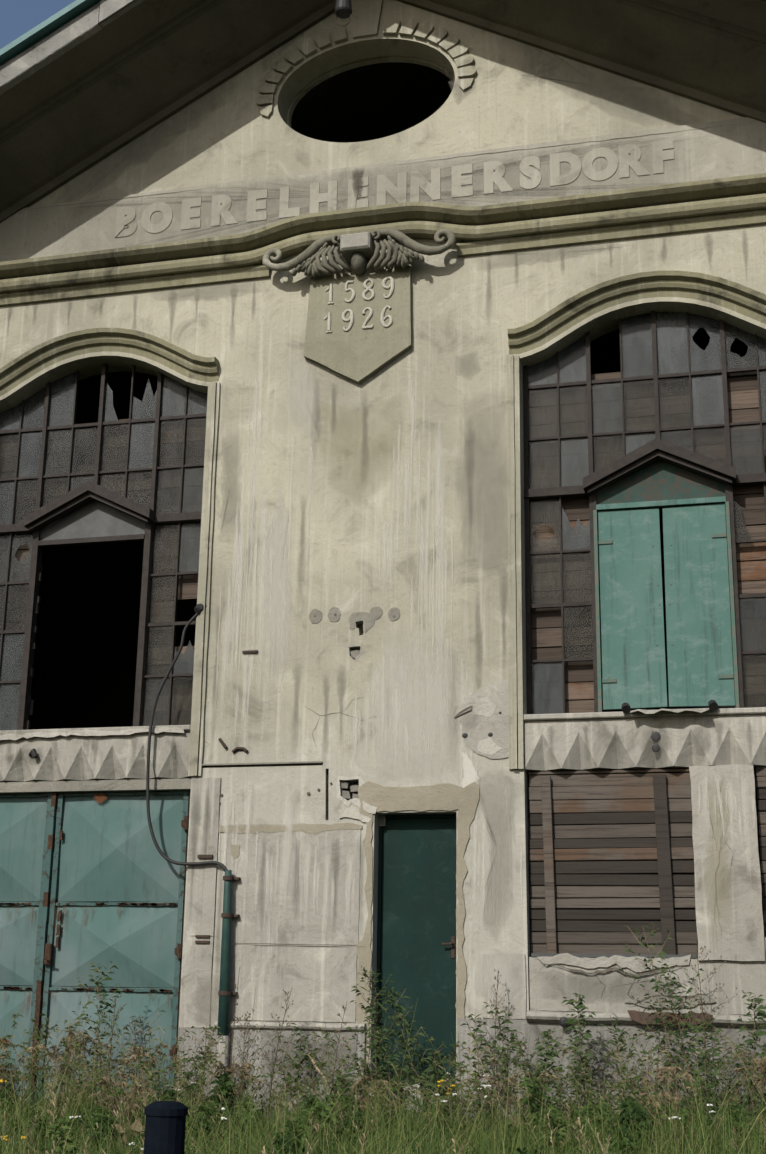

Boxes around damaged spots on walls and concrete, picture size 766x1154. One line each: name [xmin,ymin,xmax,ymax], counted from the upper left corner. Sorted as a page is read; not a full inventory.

leakage [349,458,480,788]
spalling [537,953,716,1025]